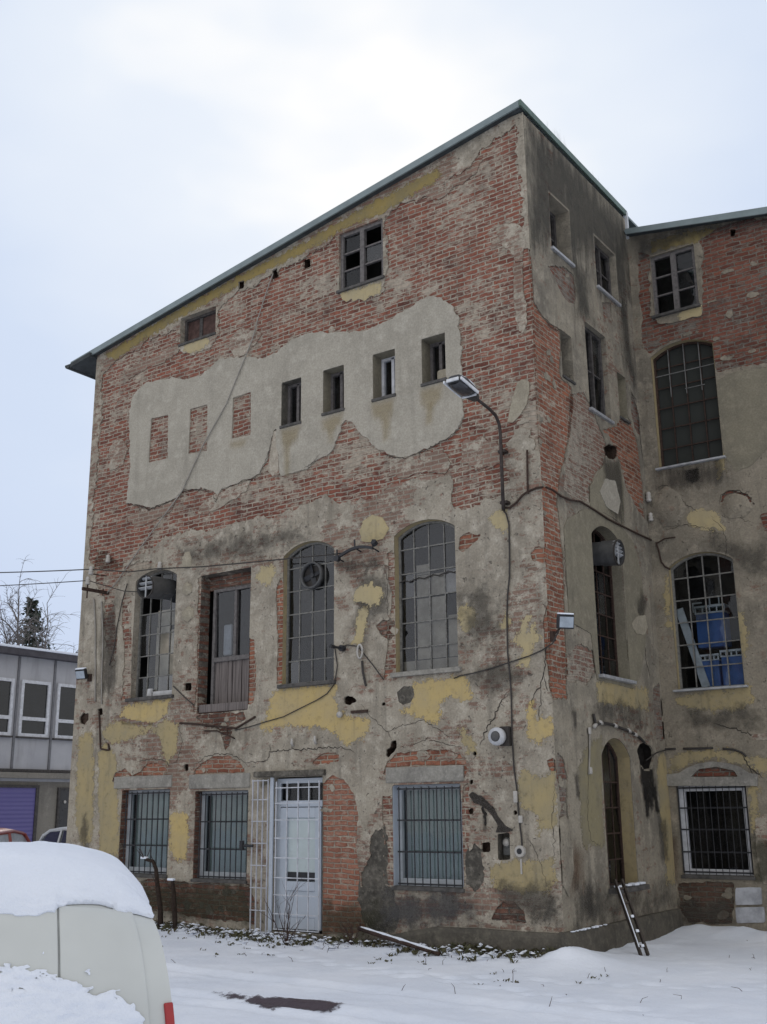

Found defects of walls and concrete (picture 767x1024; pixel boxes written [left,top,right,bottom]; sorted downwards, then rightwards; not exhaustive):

water stain [532,129,635,381]
flaking render [637,218,767,372]
flaking render [73,125,644,863]
crack [142,727,352,769]
flaking render [254,563,399,935]
crack [531,640,548,721]